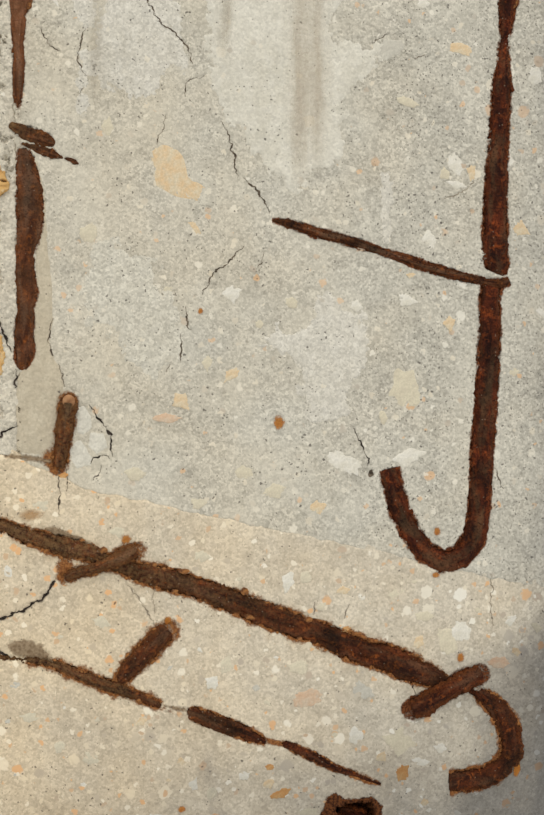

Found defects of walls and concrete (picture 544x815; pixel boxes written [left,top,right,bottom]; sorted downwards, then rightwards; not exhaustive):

crack [147,0,202,92]
corrosion [489,0,520,168]
crack [221,121,270,212]
corrosion [480,122,492,247]
corrosion [13,270,39,370]
corrosion [41,392,78,476]
corrosion [272,217,511,551]
corrosion [380,471,487,577]
crack [0,579,56,620]
corrosion [1,531,431,720]
corrosion [276,605,522,727]
corrosion [320,793,383,815]